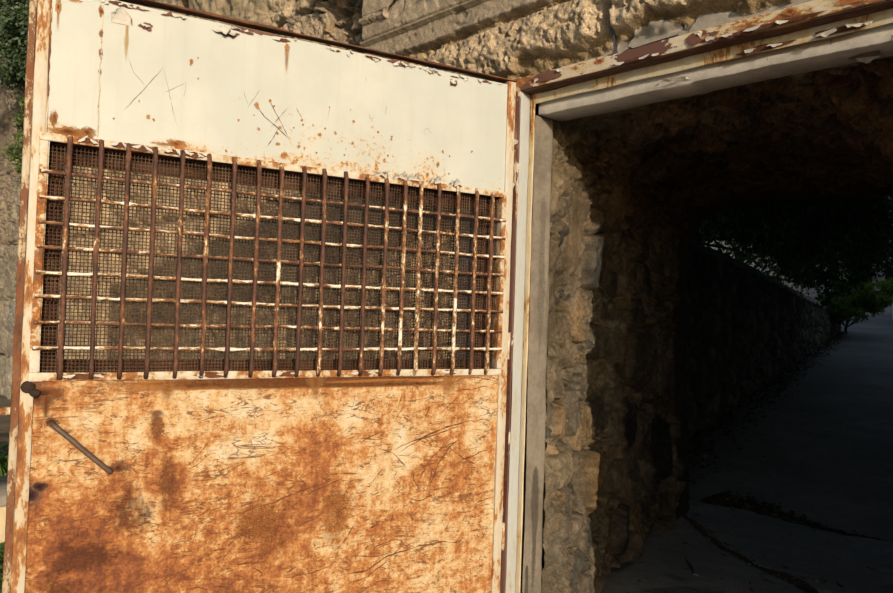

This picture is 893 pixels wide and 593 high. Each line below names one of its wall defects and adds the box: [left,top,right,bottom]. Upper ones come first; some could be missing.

peeling [101,0,153,32]
spalling [161,0,189,19]
peeling [211,25,297,43]
spalling [314,0,827,88]
peeling [815,20,873,38]
corrosion [49,111,96,138]
corrosion [152,139,187,149]
corrosion [89,375,485,397]
corrosion [33,385,64,428]
corrosion [152,410,164,439]
corrosion [29,482,48,502]
crack [684,515,819,593]